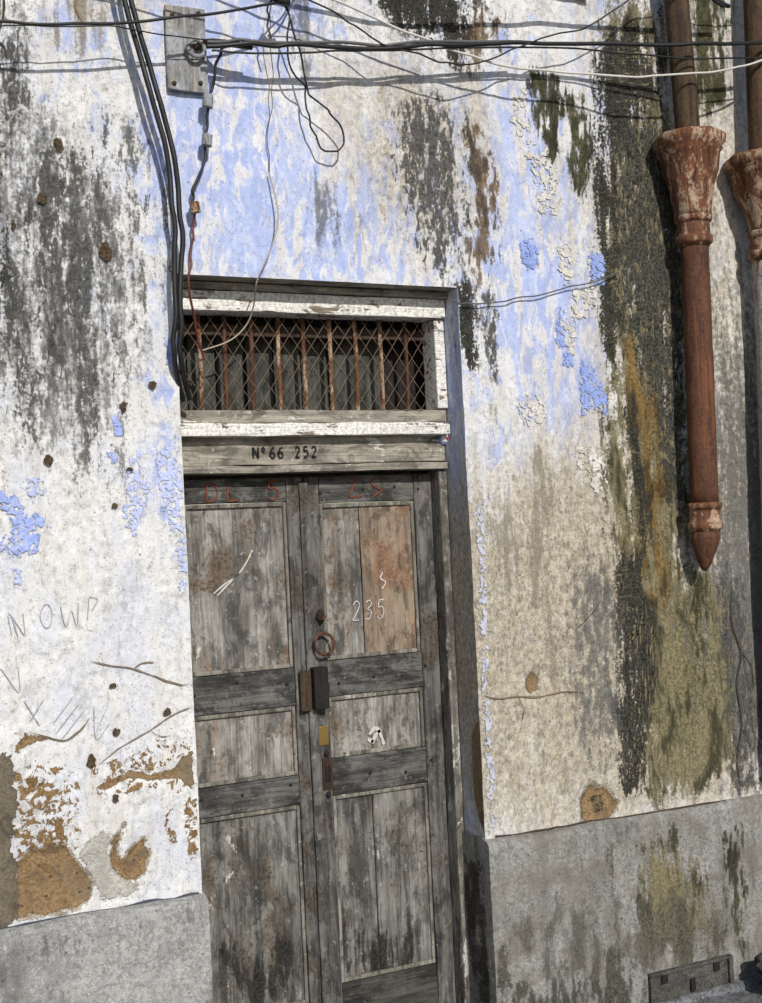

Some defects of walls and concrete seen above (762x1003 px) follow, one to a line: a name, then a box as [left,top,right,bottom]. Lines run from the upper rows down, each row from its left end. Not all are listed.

leakage [370,0,508,78]
peeling [0,477,51,585]
leakage [0,26,150,467]
leakage [388,91,502,383]
peeling [556,243,609,415]
peeling [575,443,608,496]
leakage [526,0,762,811]
crack [31,719,89,741]
spalling [13,733,152,922]
crack [0,892,199,930]
crack [91,661,199,860]
leakage [489,822,749,1003]